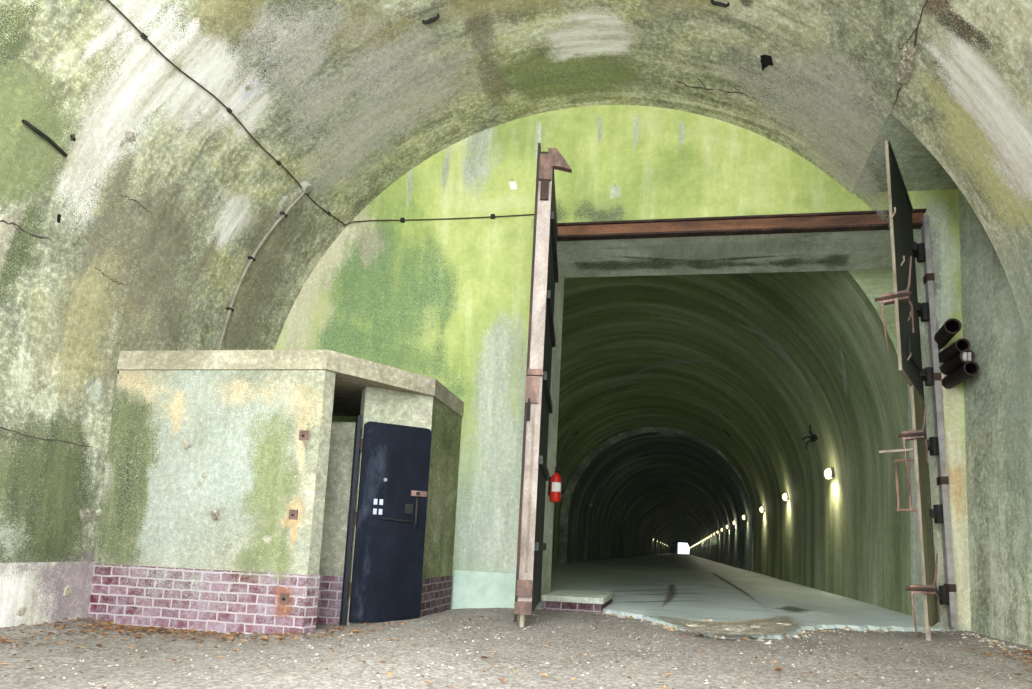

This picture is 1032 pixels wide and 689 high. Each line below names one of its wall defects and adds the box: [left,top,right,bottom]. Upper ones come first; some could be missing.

rust [922,0,986,42]
crack [890,0,928,117]
damp [533,121,543,168]
crack [0,220,55,243]
damp [0,0,513,551]
crack [0,427,98,449]
damp [453,307,529,573]